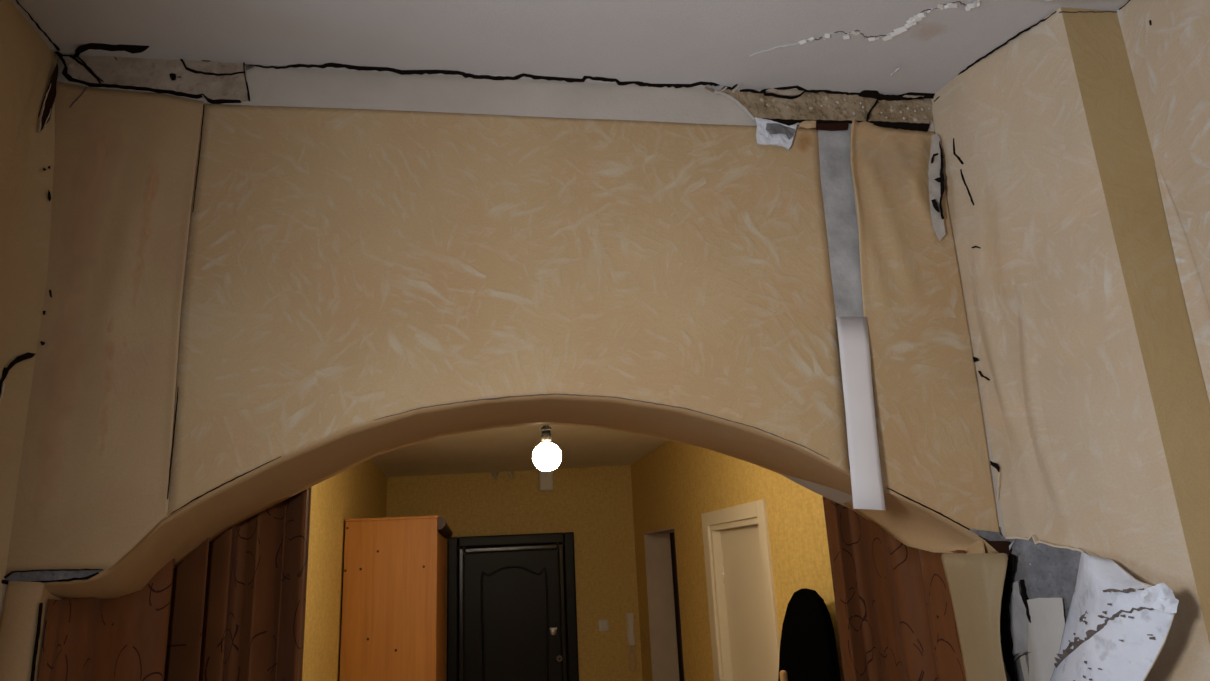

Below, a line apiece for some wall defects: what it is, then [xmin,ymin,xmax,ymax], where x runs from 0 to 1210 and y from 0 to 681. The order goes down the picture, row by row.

crack [247,0,1152,102]
peeling [750,0,981,56]
flaking render [705,87,934,324]
crack [0,341,45,401]
crack [1,569,103,681]
flaking render [969,529,1095,681]